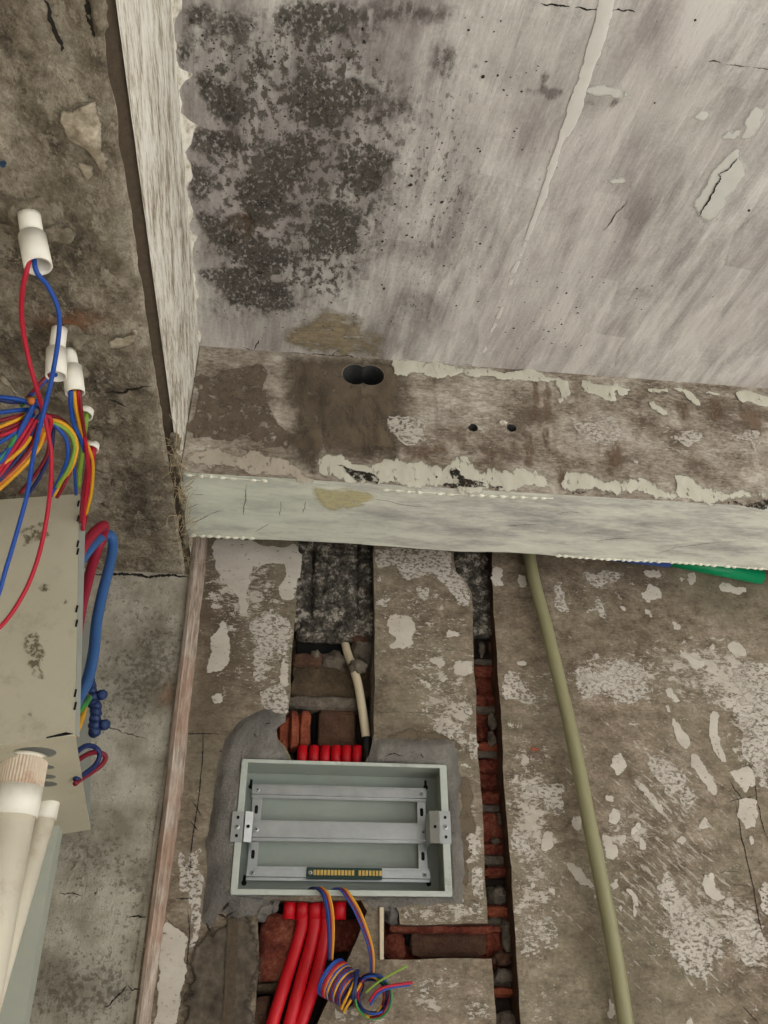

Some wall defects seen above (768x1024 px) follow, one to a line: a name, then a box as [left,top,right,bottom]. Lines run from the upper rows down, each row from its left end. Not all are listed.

crack [44,0,64,52]
crack [84,0,95,37]
crack [541,3,635,12]
leakage [178,0,459,473]
leakage [381,184,486,324]
crack [700,157,738,215]
flaking render [186,359,768,510]
crack [95,571,187,579]
flaking render [206,620,230,673]
flaking render [211,538,344,761]
flaking render [709,641,768,845]
flaking render [656,871,768,990]